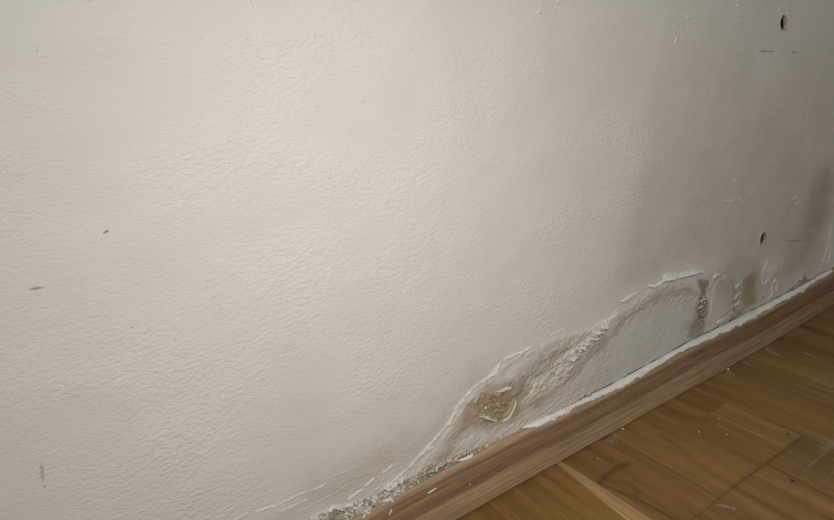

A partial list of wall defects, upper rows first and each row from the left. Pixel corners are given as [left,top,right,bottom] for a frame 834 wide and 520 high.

flaking render [307,268,710,520]
spalling [730,279,744,321]